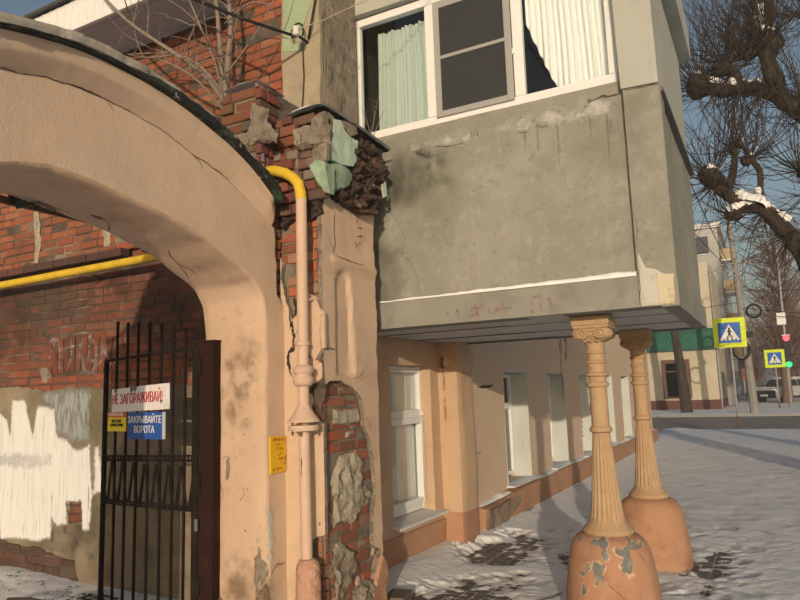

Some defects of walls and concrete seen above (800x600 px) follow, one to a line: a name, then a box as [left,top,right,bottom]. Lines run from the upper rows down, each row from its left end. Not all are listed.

crack [0,67,229,181]
peeling [309,112,357,195]
efflorescence [495,98,614,133]
crack [329,204,367,265]
spalling [638,254,675,306]
crack [287,297,297,377]
spalling [487,495,522,531]
spalling [253,539,269,600]
spalling [352,575,375,600]
peeling [577,535,644,595]